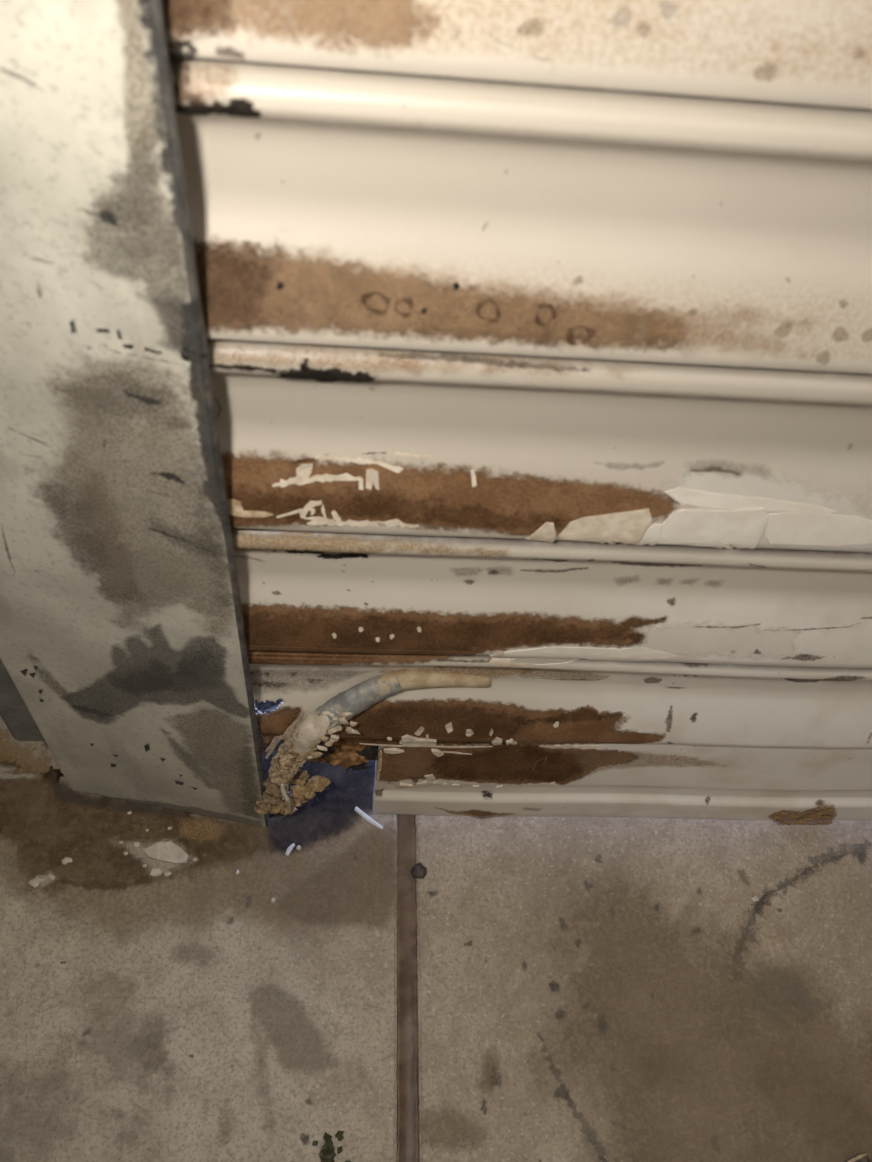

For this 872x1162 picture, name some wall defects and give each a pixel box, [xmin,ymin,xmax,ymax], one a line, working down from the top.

corrosion [162,0,438,50]
corrosion [194,240,768,350]
peeling [180,303,432,535]
corrosion [222,453,675,556]
peeling [511,487,872,549]
damp [73,706,113,724]
damp [254,699,281,713]
peeling [307,711,360,759]
corrosion [241,604,665,759]
corrosion [254,699,706,815]
damp [0,731,396,925]
corrosion [770,801,837,825]